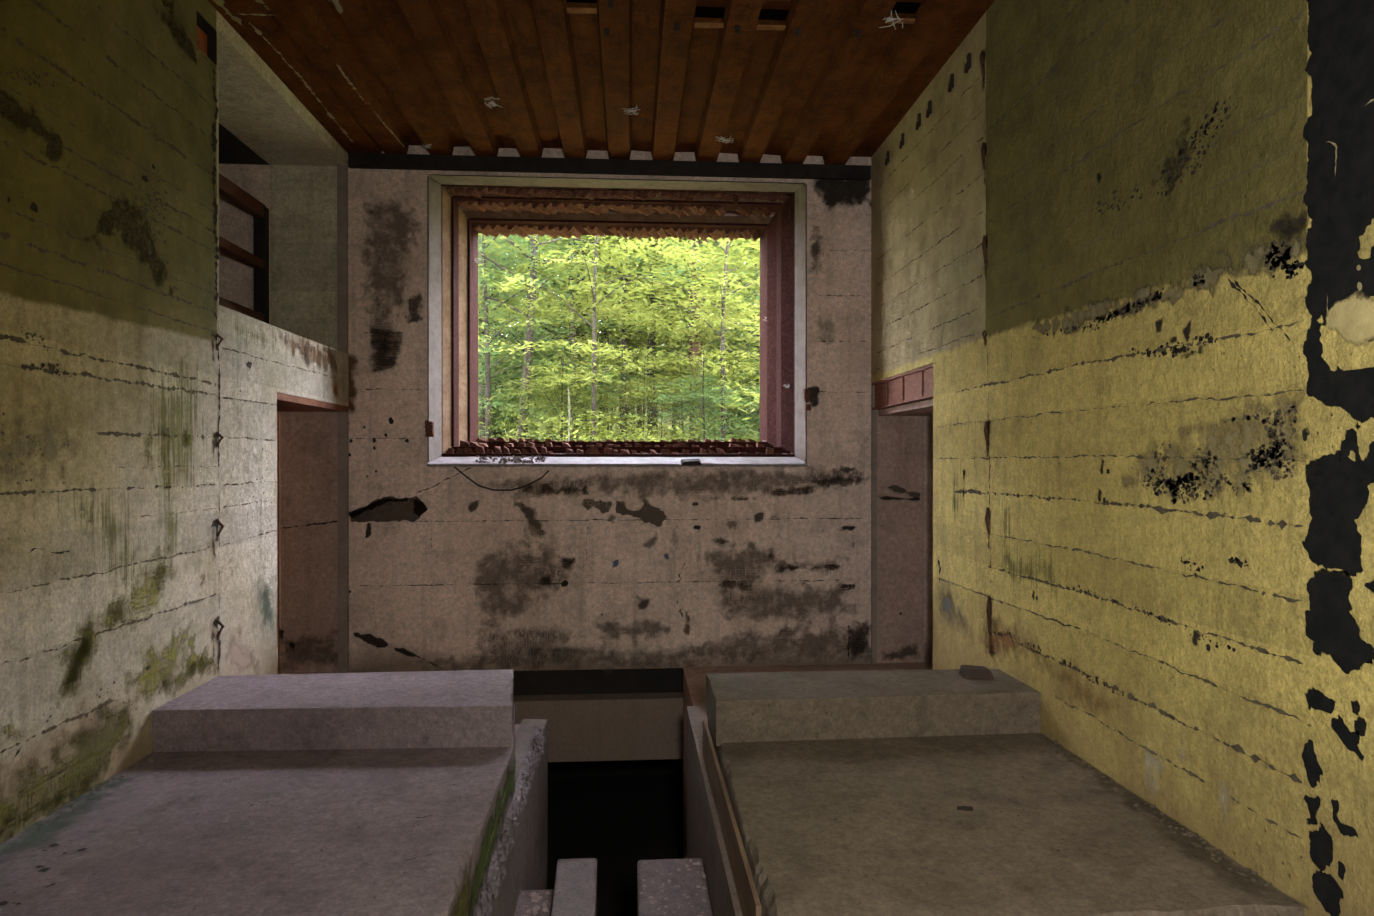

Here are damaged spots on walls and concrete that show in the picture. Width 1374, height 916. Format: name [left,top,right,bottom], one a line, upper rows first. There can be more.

peeling [1032,0,1374,674]
spalling [348,496,428,538]
damp [437,468,918,670]
peeling [1060,659,1124,696]
peeling [1302,688,1367,916]